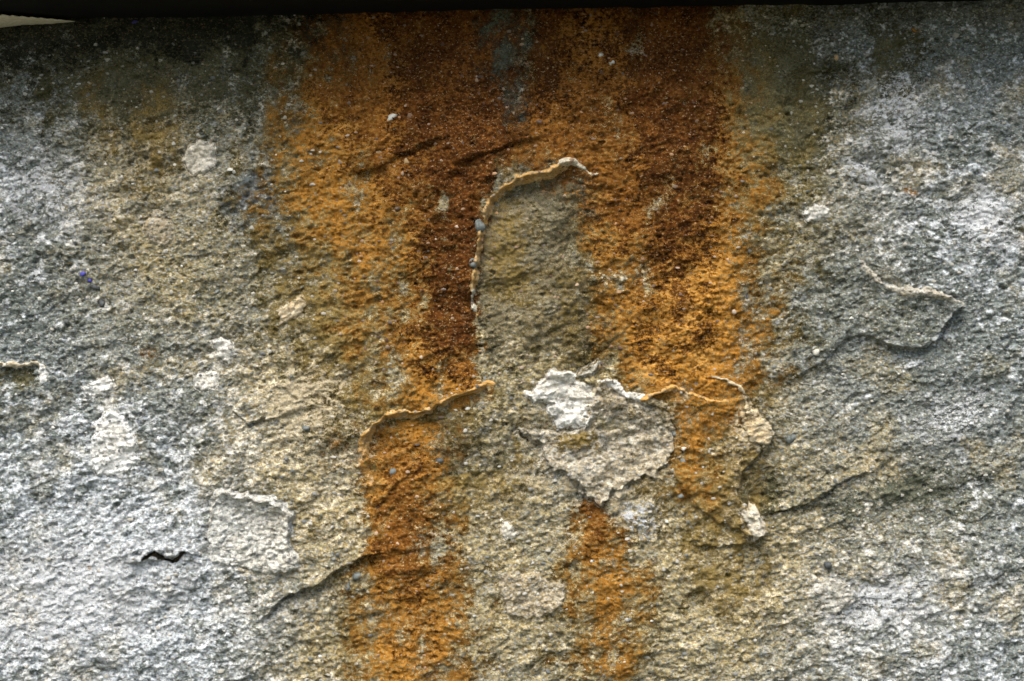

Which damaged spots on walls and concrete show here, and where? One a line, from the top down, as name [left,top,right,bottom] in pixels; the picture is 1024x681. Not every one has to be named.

rust [211,4,856,681]
peeling [469,157,676,516]
crack [141,551,185,563]
peeling [741,509,765,542]